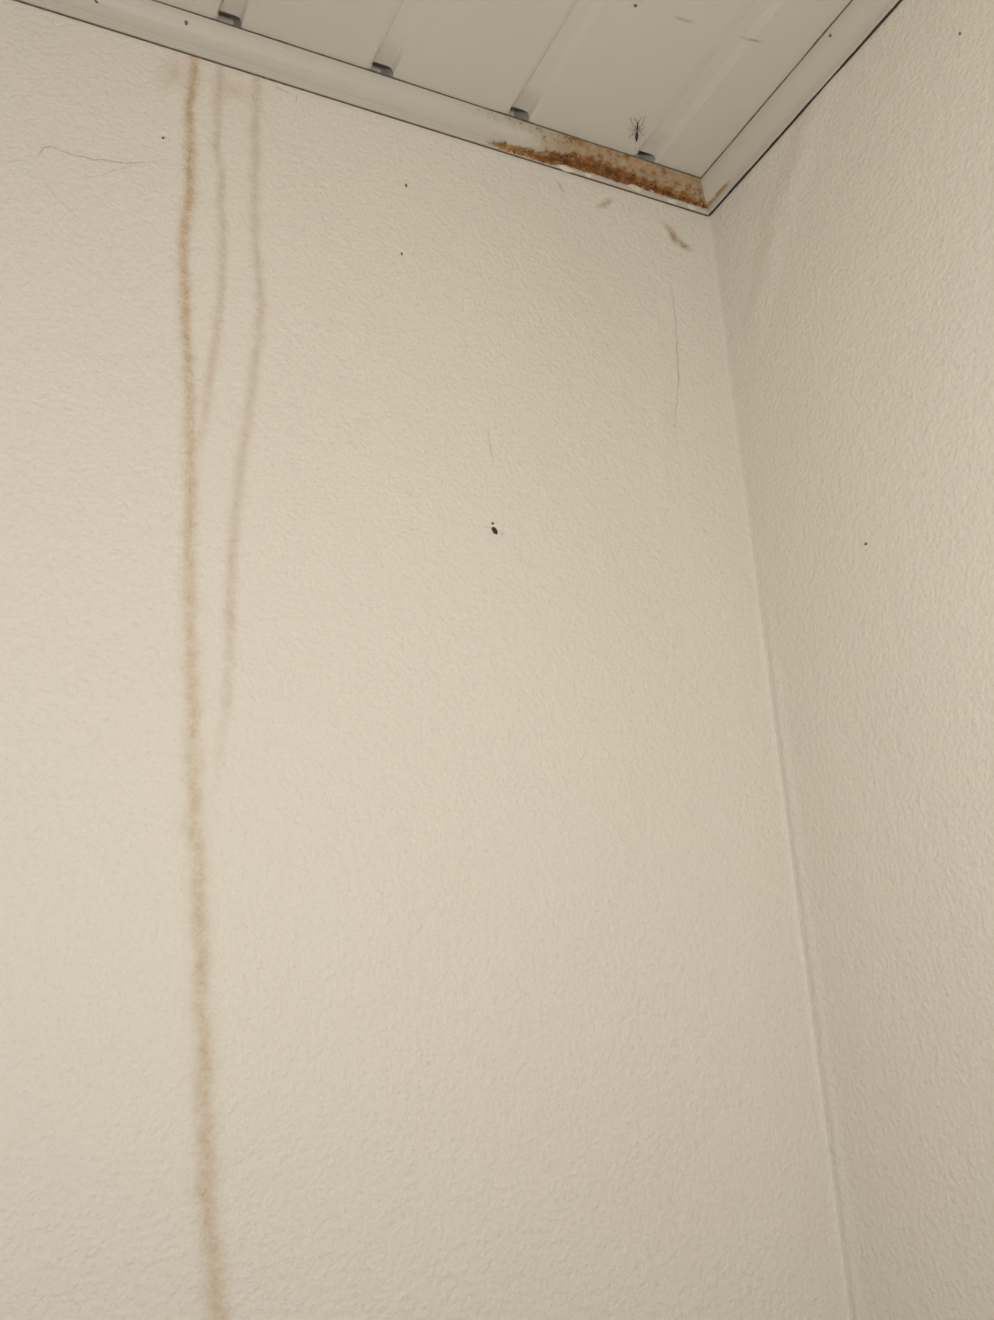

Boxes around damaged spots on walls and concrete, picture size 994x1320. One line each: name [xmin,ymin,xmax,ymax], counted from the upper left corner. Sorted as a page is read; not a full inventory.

rust [492,123,727,210]